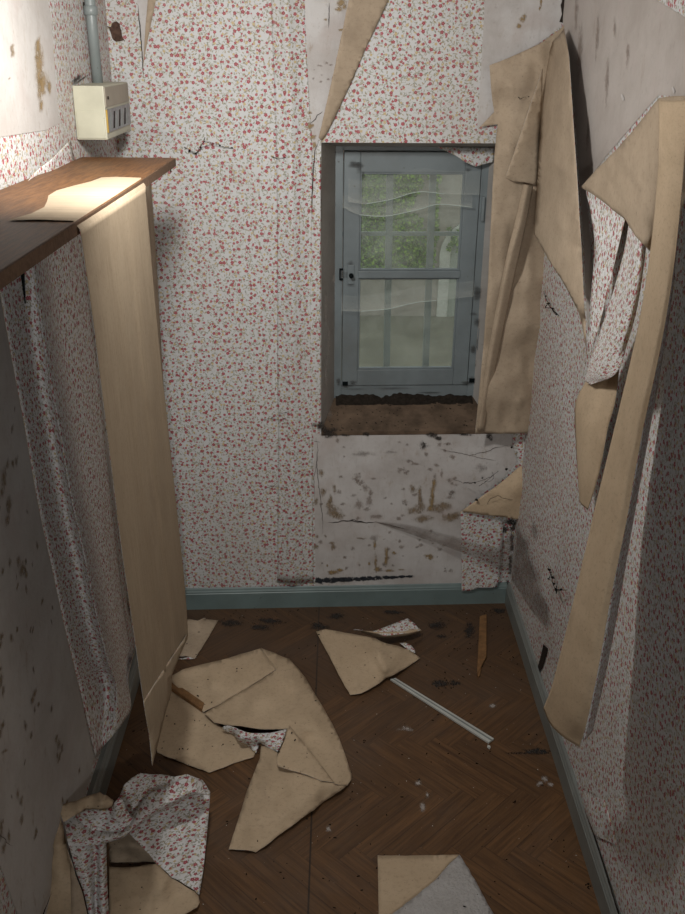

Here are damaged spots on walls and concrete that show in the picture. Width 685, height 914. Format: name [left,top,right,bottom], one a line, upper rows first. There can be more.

peeling [305,0,388,154]
peeling [477,0,685,328]
peeling [0,296,94,914]
water stain [315,486,342,518]
water stain [315,575,413,584]
peeling [313,433,522,586]
water stain [409,487,458,522]